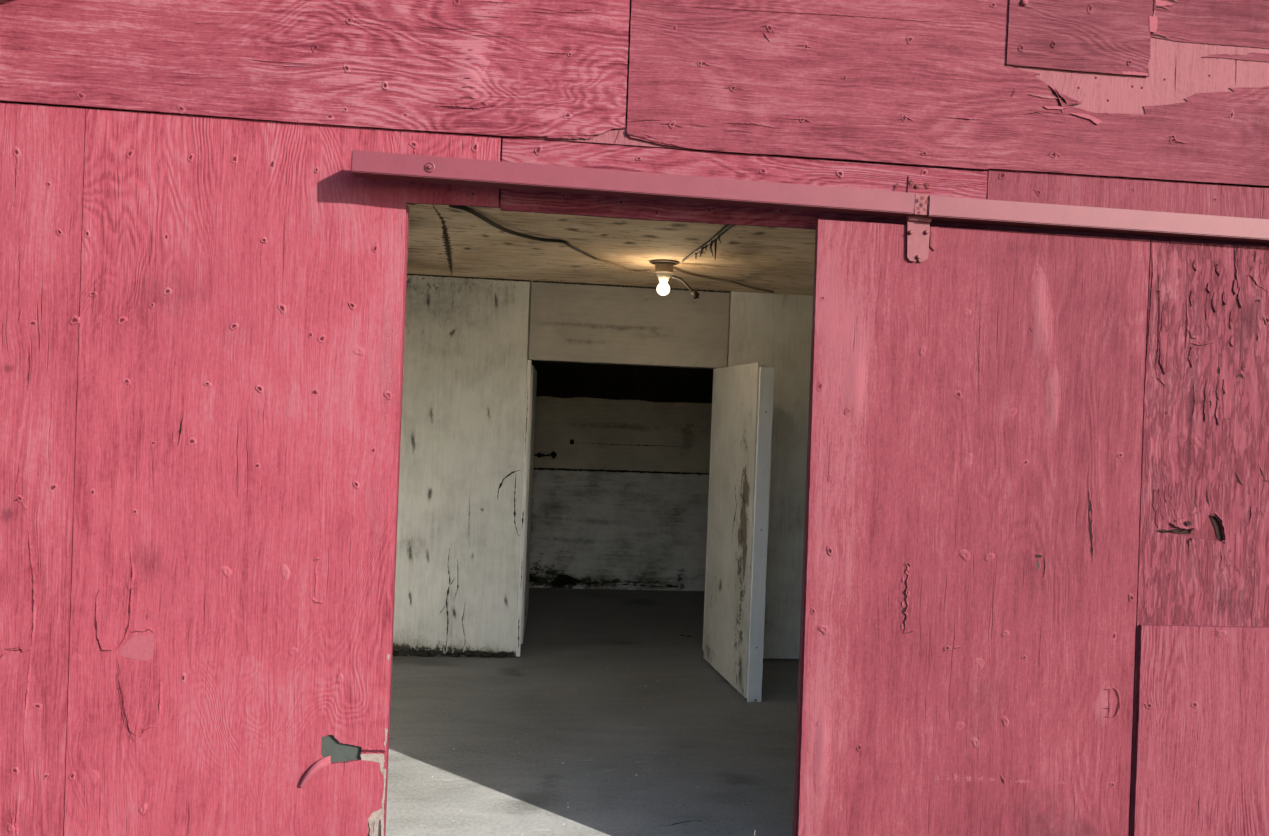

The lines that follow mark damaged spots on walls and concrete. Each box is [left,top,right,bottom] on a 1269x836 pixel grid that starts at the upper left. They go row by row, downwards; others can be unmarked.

peeling [1013,37,1269,124]
crack [14,158,33,391]
crack [407,203,453,275]
crack [0,465,37,736]
water stain [529,574,600,588]
crack [94,552,162,742]
water stain [392,648,516,658]
spalling [368,768,386,836]